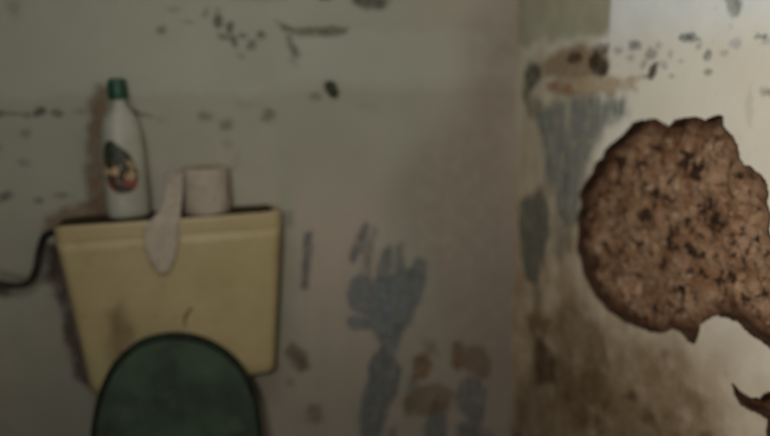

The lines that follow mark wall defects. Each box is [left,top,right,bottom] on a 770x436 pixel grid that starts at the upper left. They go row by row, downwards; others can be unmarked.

flaking render [324,81,339,98]
peeling [544,46,621,95]
peeling [519,190,549,282]
flaking render [577,115,770,348]
flaking render [732,383,770,436]